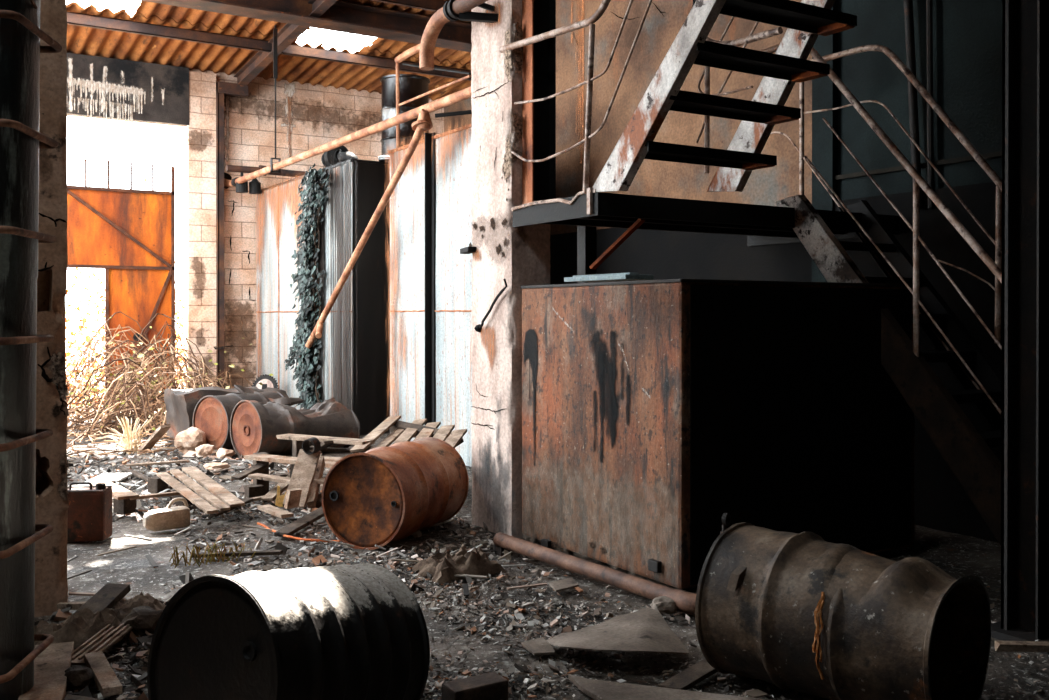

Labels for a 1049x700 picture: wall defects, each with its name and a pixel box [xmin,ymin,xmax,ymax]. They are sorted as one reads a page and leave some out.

water stain [67,58,164,128]
rust [256,176,303,270]
rust [388,126,468,415]
water stain [593,331,624,462]